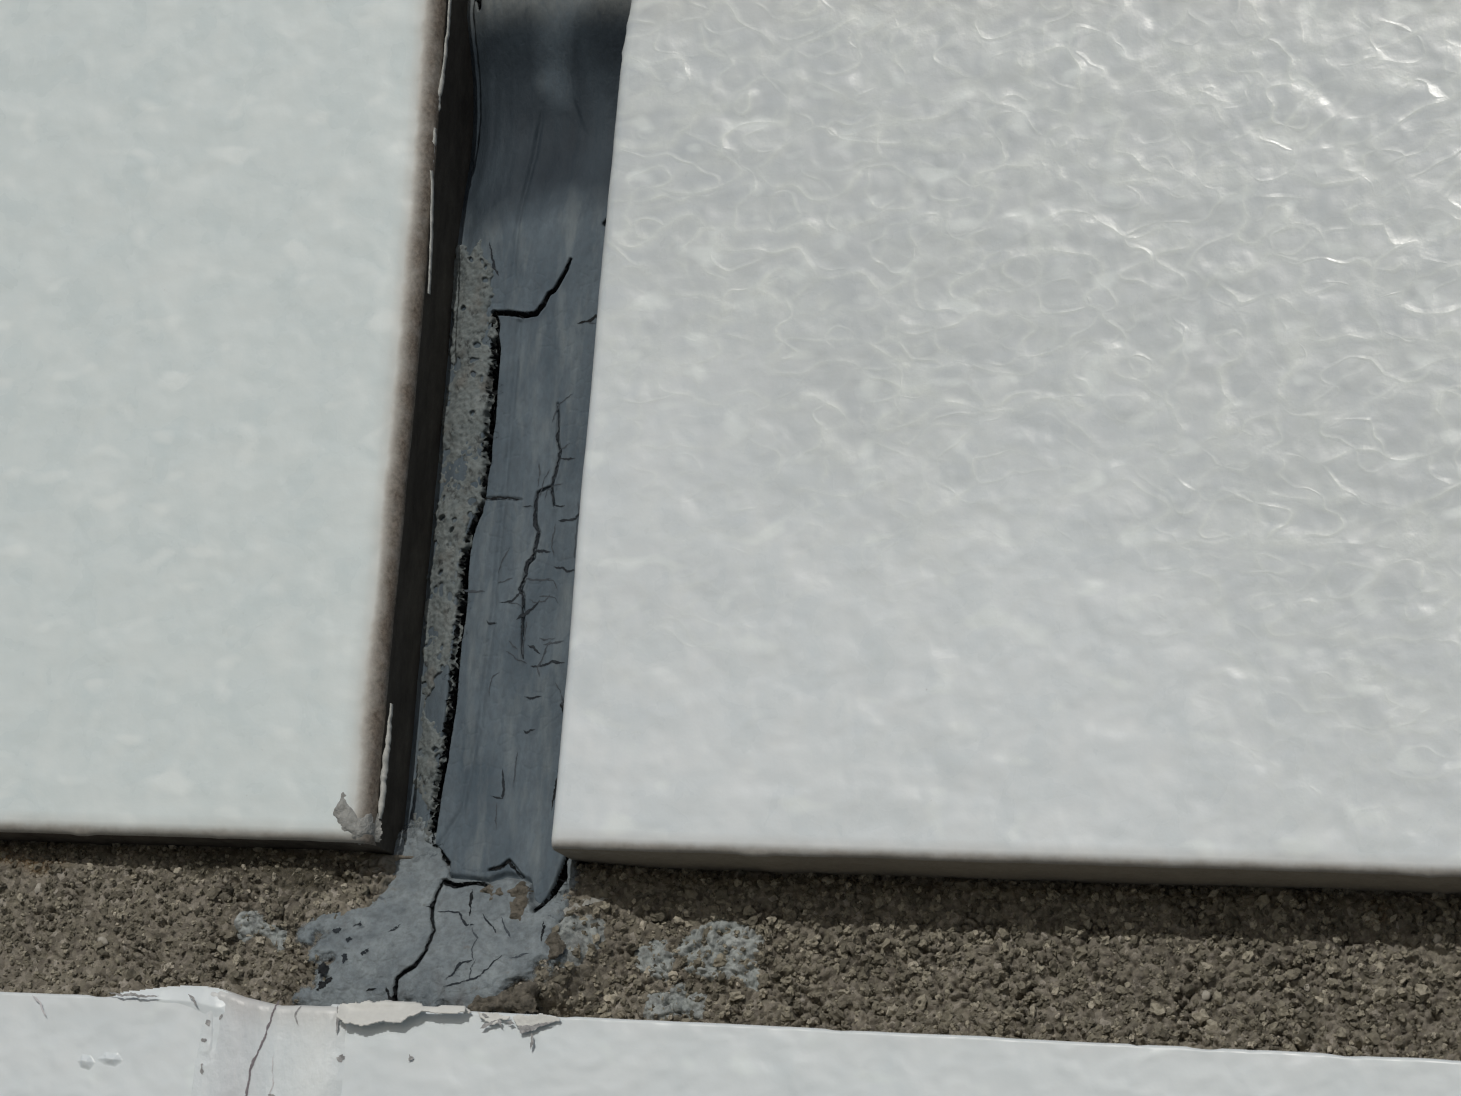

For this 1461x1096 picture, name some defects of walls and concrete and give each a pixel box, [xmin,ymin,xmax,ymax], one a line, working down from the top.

crack [489,242,499,276]
crack [578,314,597,324]
crack [366,259,579,1001]
peeling [108,985,232,1042]
crack [245,1001,279,1096]
peeling [336,1000,561,1049]